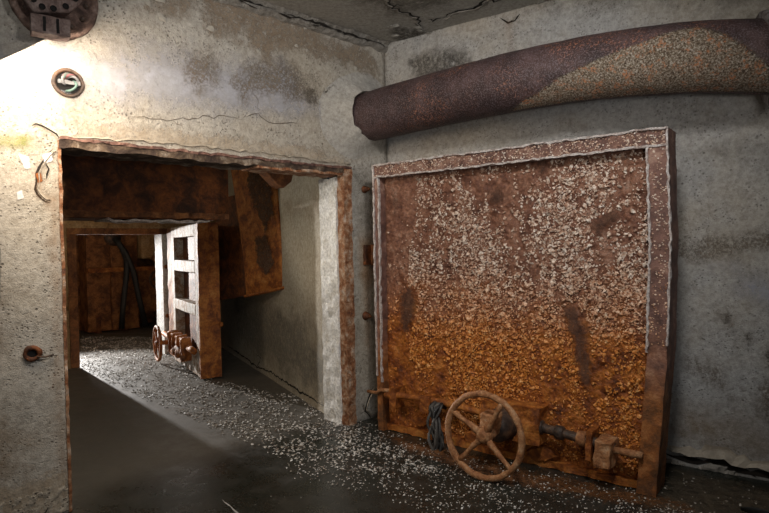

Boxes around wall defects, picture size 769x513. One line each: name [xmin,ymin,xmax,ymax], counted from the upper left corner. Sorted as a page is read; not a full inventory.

crack [381,0,520,30]
water stain [26,52,302,111]
corrosion [399,440,687,509]